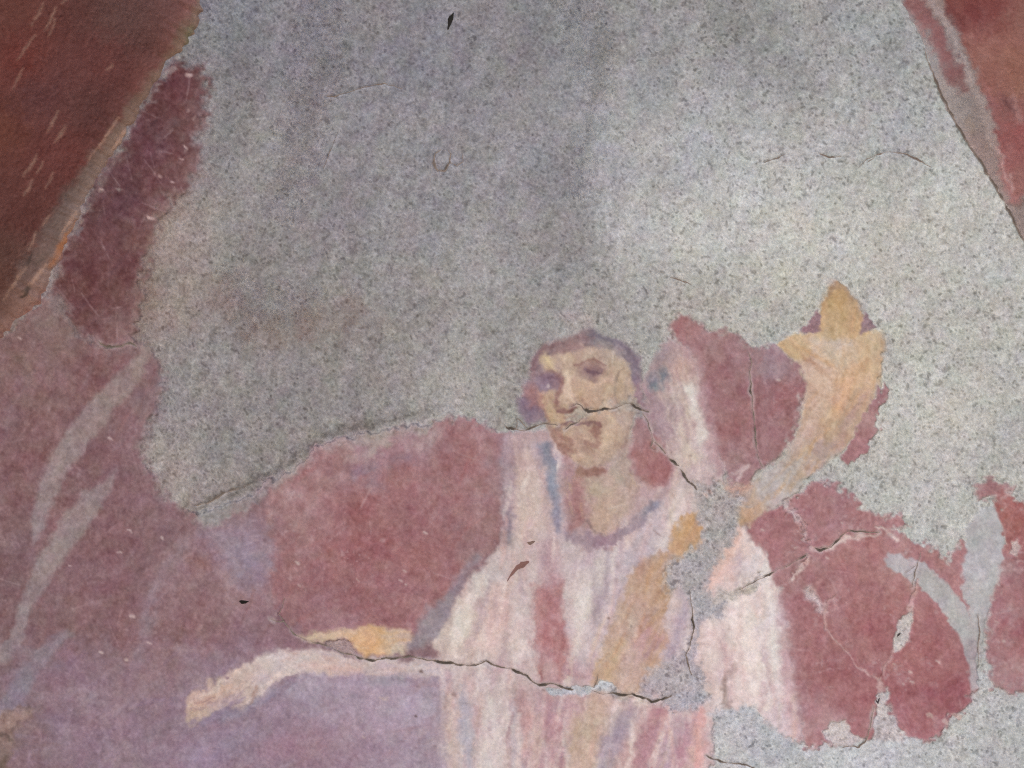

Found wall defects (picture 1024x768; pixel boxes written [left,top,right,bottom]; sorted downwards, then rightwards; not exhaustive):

spalling [0,0,1024,565]
crack [505,403,697,490]
crack [739,530,879,590]
spalling [639,394,1024,768]
crack [271,601,672,703]
crack [685,590,701,680]
crack [843,710,874,748]